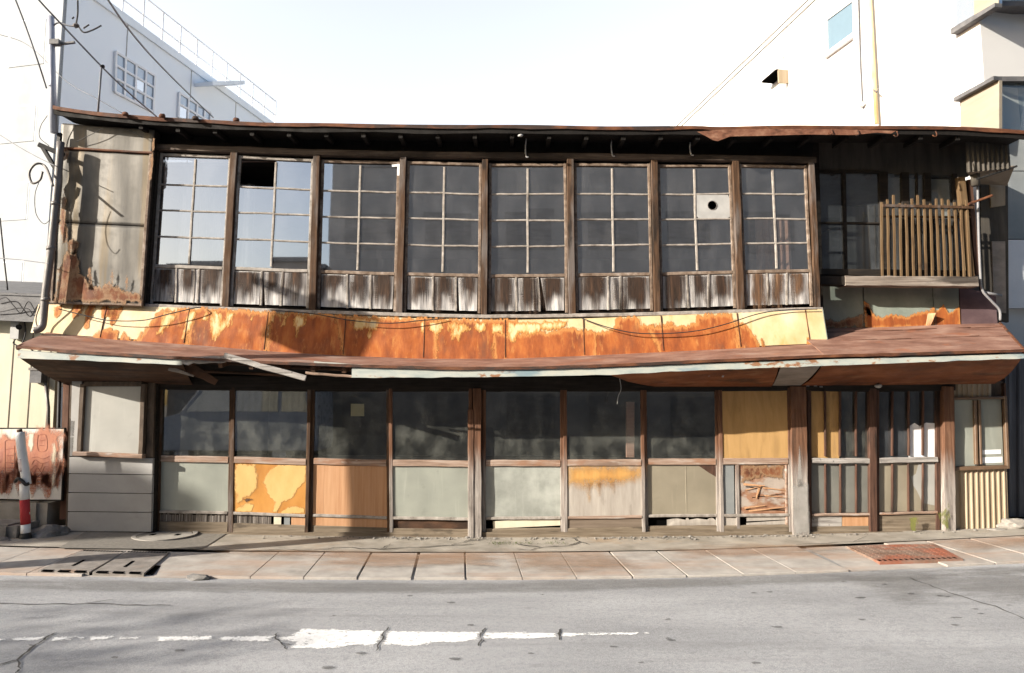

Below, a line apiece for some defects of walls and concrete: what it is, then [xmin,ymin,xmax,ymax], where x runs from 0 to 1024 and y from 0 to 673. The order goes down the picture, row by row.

water stain [320,275,395,309]
corrosion [54,189,766,359]
water stain [408,277,479,310]
water stain [493,278,561,314]
water stain [581,277,650,312]
water stain [665,275,732,312]
corrosion [0,426,64,498]
peeling [234,463,306,514]